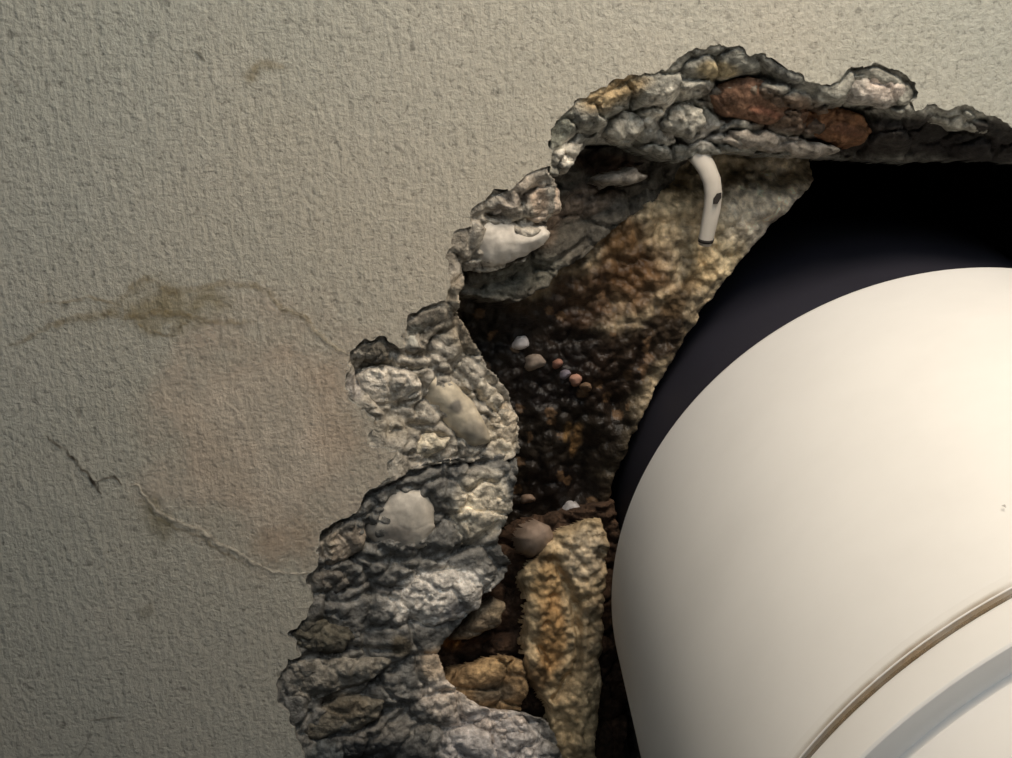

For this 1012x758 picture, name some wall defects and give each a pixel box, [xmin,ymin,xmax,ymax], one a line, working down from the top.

crack [47,437,121,492]
spalling [276,44,1012,758]